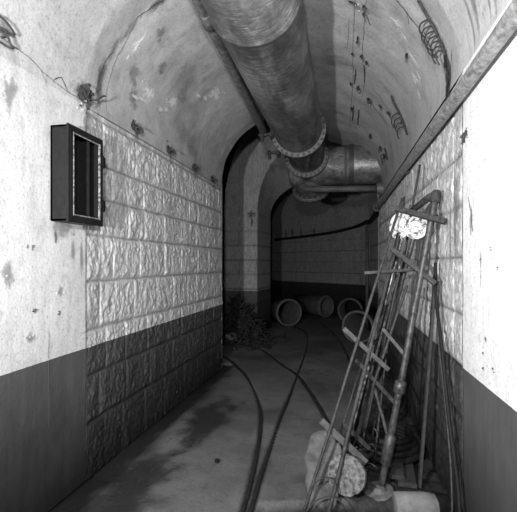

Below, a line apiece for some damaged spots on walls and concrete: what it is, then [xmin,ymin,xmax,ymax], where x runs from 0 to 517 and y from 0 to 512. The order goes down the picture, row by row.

crack [97,0,164,93]
leakage [181,404,237,448]
leakage [83,455,171,512]